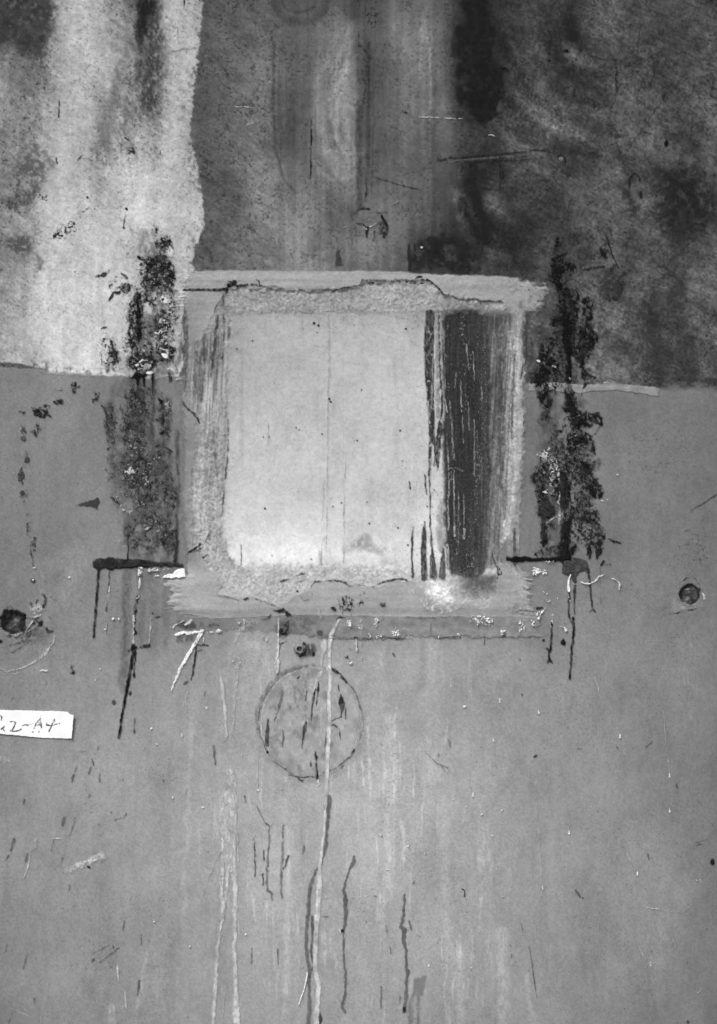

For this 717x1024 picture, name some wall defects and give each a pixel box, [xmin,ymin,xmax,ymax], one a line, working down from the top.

damp [0,0,55,55]
damp [135,0,162,111]
damp [407,233,470,273]
damp [130,243,172,382]
damp [411,308,528,614]
damp [92,568,110,638]
damp [117,405,180,738]
damp [567,569,596,679]
damp [254,825,289,897]
damp [305,619,340,1024]
damp [339,856,355,1013]
damp [399,894,412,1012]